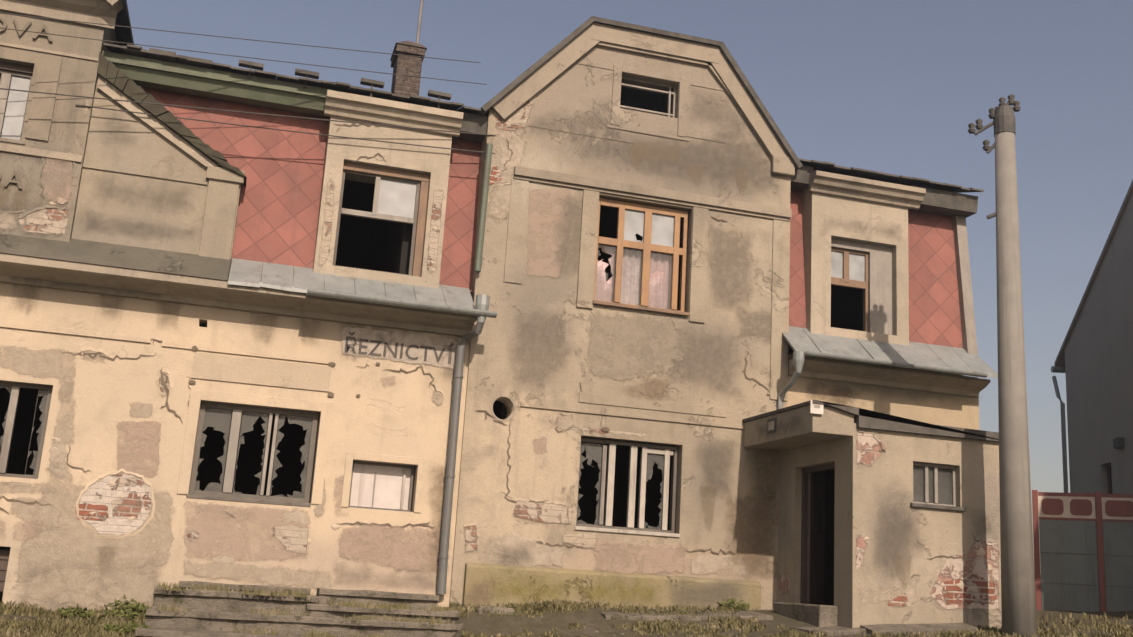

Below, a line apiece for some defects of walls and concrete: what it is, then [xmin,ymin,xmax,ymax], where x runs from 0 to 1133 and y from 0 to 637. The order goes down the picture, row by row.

spalling [0,151,78,238]
spalling [486,82,551,224]
crack [63,339,191,423]
crack [357,364,437,392]
crack [0,495,47,513]
peeling [0,346,200,589]
peeling [184,476,441,589]
crack [476,404,563,503]
peeling [462,497,596,567]
spalling [857,428,887,469]
spalling [928,537,1001,614]